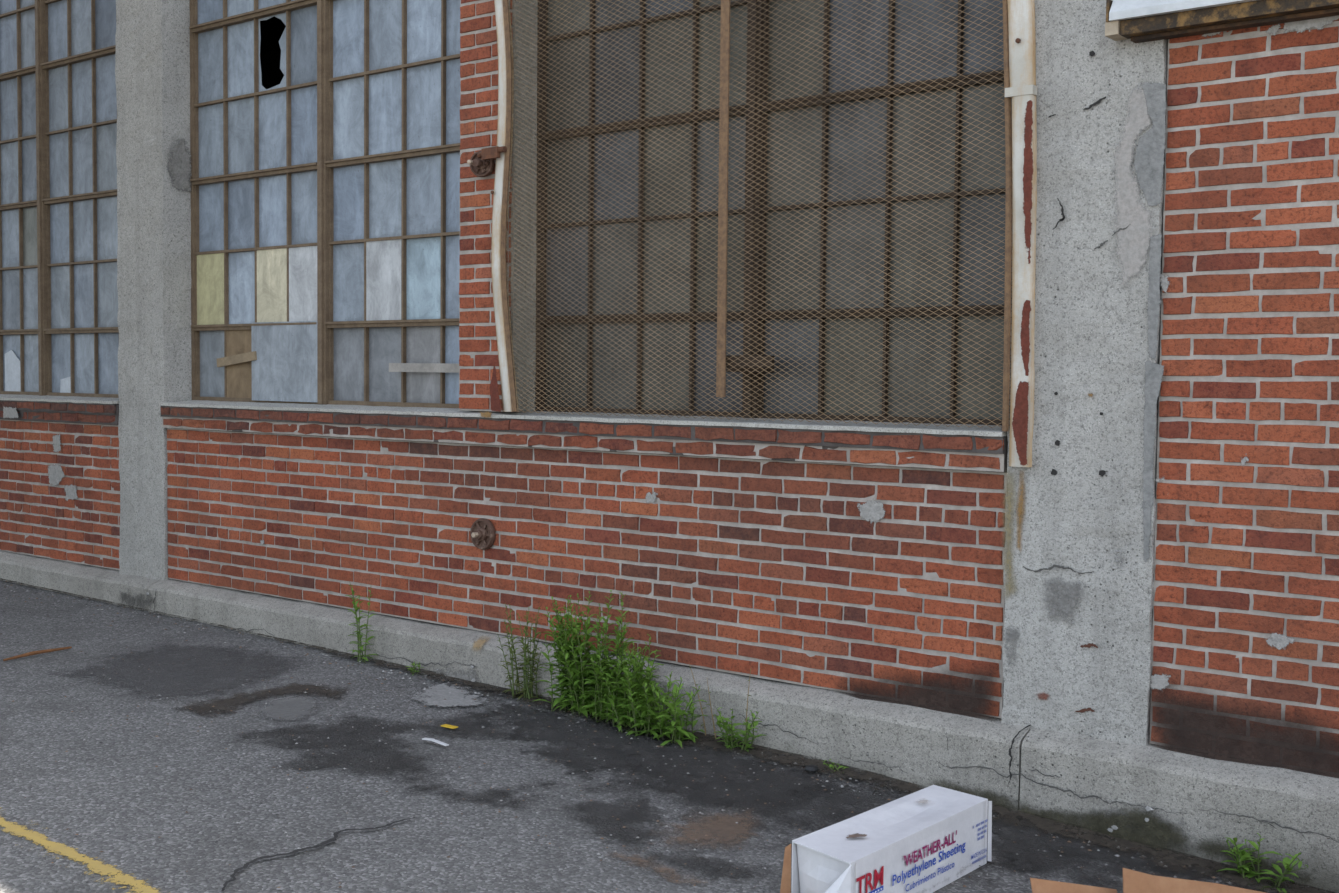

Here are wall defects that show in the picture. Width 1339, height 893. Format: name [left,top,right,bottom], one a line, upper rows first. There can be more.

crack [1023,564,1092,574]
water stain [1152,690,1339,778]
crack [739,714,1339,843]